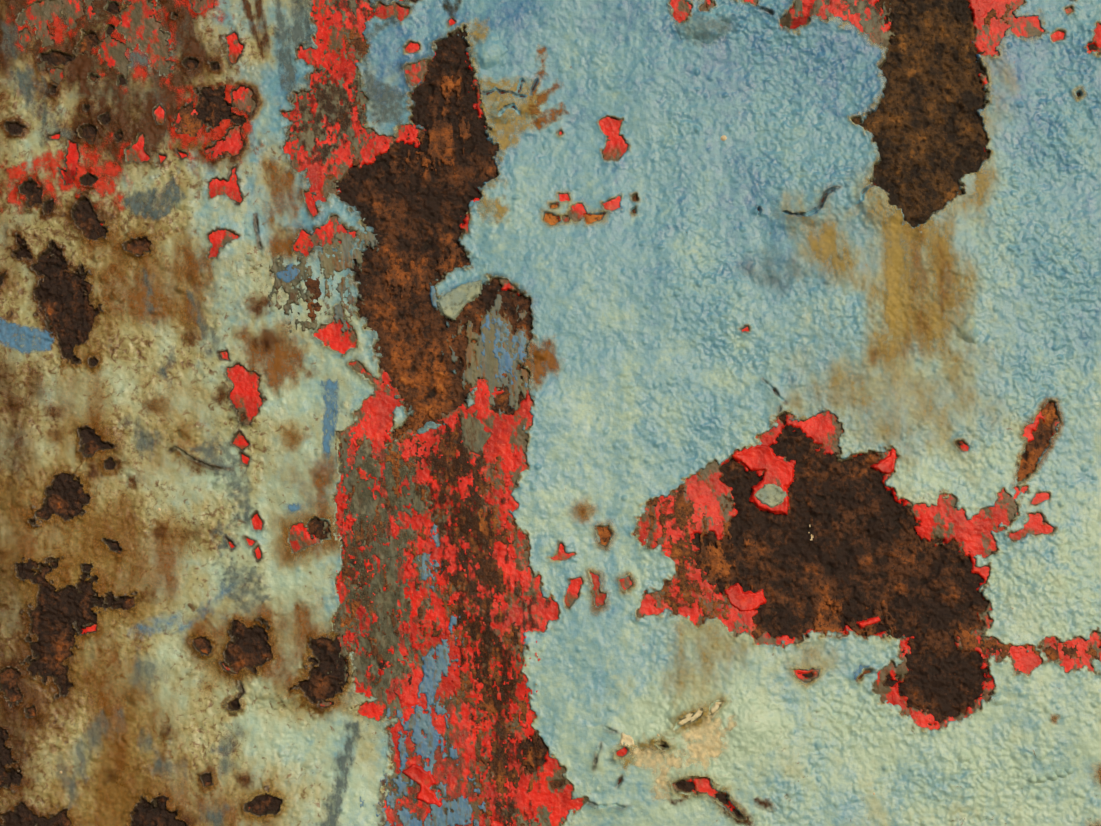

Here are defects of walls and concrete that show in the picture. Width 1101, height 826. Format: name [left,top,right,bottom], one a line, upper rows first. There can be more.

corrosion [0,0,261,791]
corrosion [235,329,311,391]
corrosion [263,64,370,257]
peeling [260,0,606,826]
peeling [544,194,637,225]
peeling [599,117,628,161]
corrosion [802,211,854,280]
peeling [780,0,1064,227]
corrosion [864,167,995,404]
corrosion [186,603,353,713]
peeling [632,402,1101,730]
peeling [673,778,743,818]